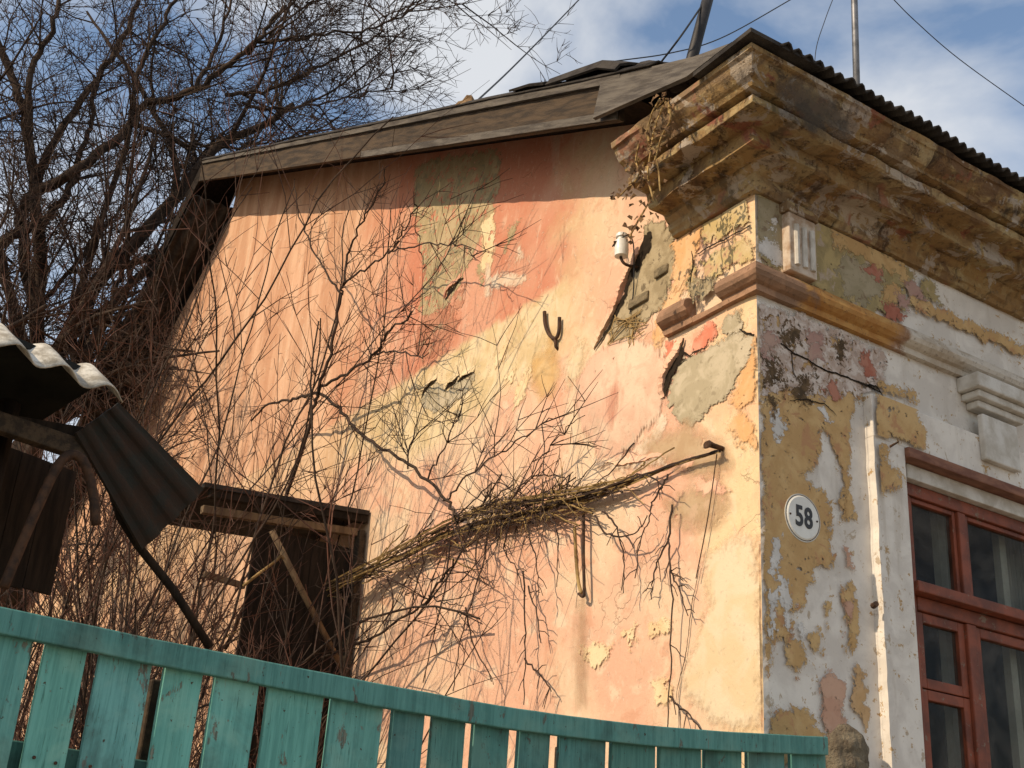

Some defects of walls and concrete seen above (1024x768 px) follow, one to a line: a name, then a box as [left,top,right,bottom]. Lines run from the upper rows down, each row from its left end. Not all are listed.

crack [657,338,709,399]
damp [759,303,888,421]
crack [781,343,883,415]
peeling [565,194,1024,739]